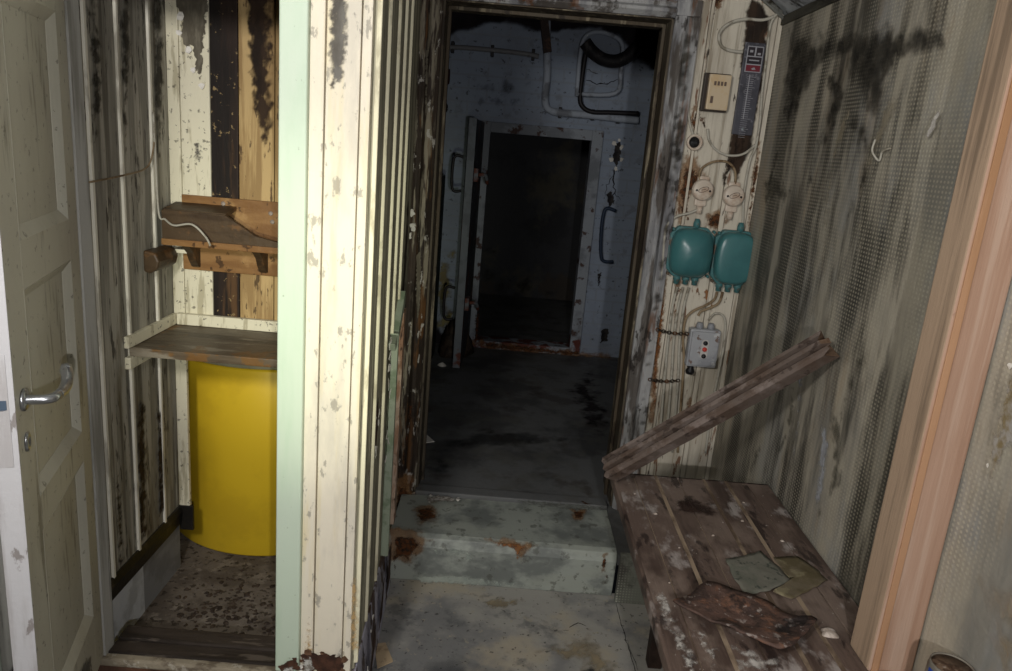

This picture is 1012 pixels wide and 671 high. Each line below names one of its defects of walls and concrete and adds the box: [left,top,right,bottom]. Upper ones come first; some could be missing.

peeling [176,0,209,89]
damp [784,30,942,155]
rust [677,157,700,220]
rust [396,474,414,510]
rust [389,506,436,569]
rust [490,539,531,559]